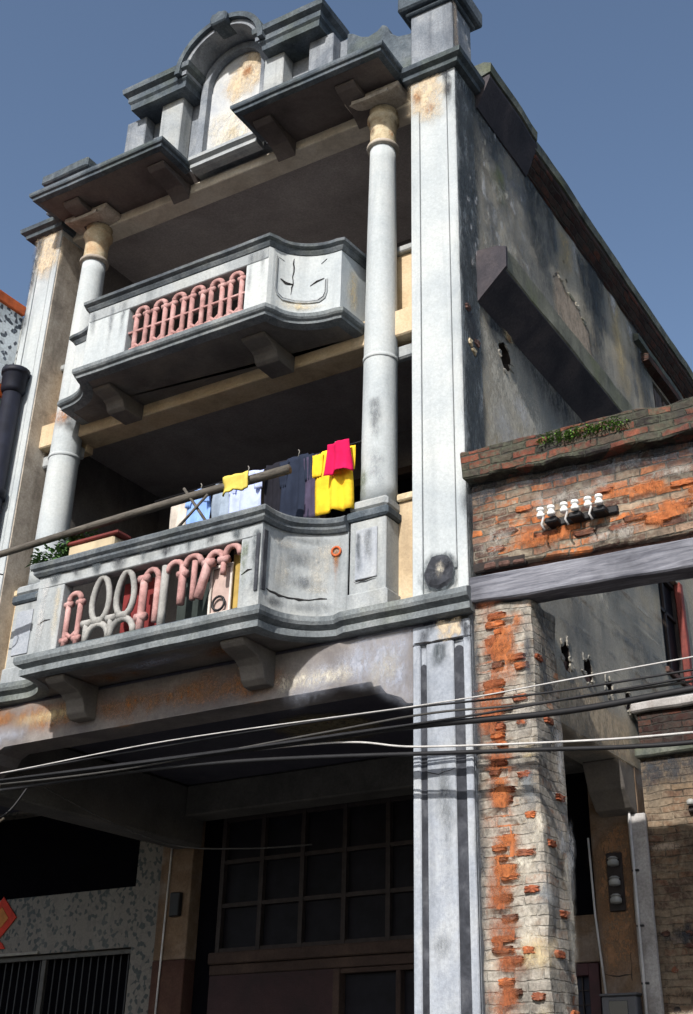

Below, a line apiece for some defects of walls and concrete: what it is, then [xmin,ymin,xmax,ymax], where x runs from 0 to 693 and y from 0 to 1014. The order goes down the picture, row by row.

crack [279,257,327,295]
flaking render [465,303,546,444]
leakage [455,69,651,452]
peeling [553,260,592,356]
flaking render [474,467,693,575]
peeling [414,616,469,644]
flaking render [543,636,634,775]
flaking render [480,611,575,1014]